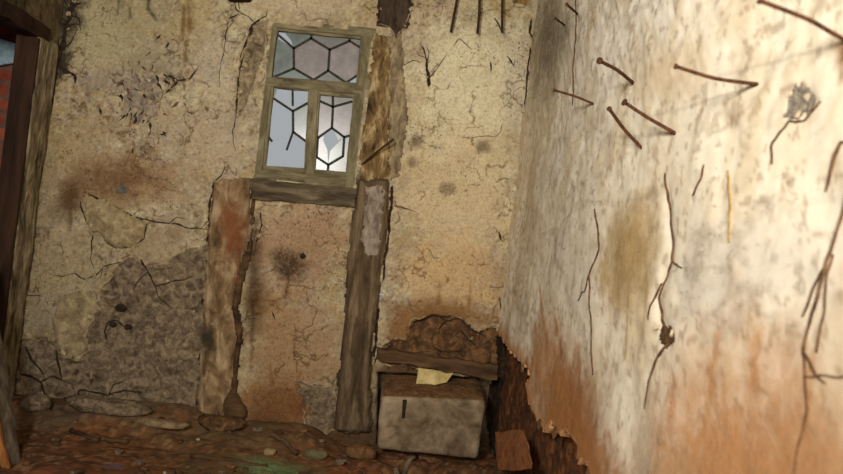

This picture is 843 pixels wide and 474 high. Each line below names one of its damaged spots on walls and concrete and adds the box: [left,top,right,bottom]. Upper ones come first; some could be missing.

crack [57,3,268,307]
crack [692,164,705,196]
crack [725,170,733,243]
crack [770,101,822,164]
crack [19,347,142,396]
spalling [15,242,209,408]
spalling [378,312,590,474]
crack [644,173,682,409]
crack [792,141,843,474]